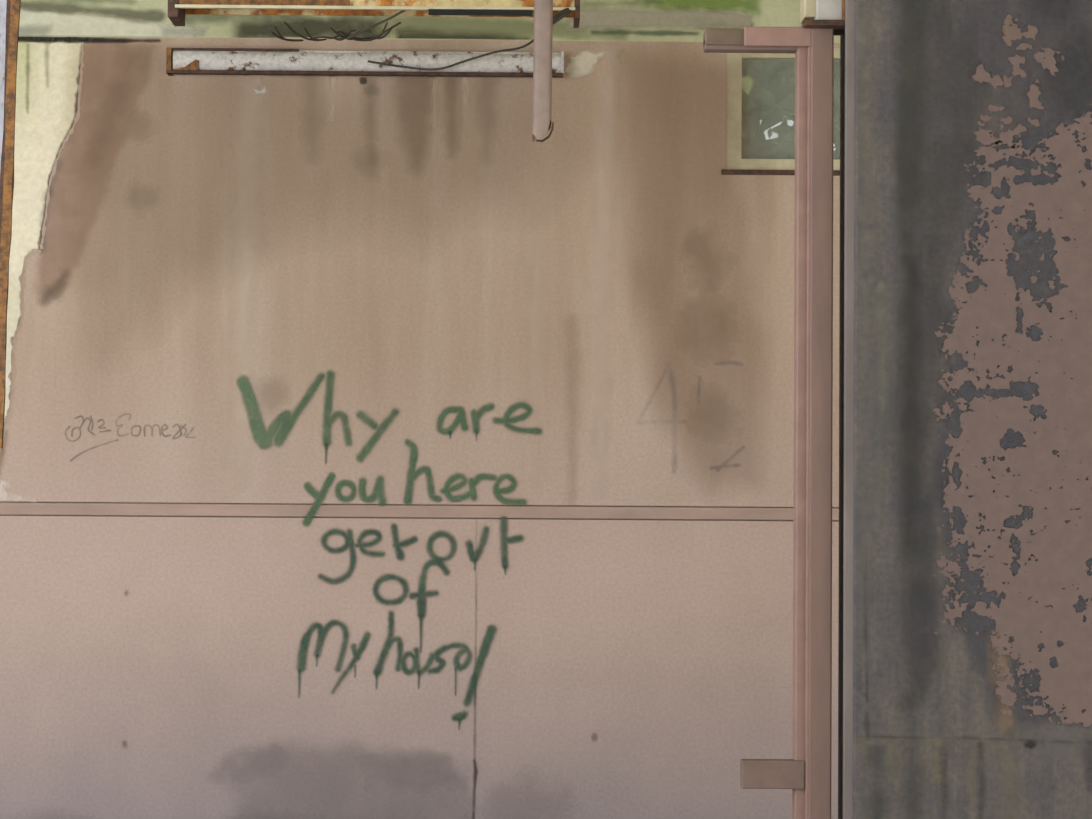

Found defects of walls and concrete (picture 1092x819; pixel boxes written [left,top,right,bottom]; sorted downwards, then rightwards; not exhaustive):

water stain [958,139,1066,341]
water stain [939,450,995,489]
water stain [951,351,1047,433]
peeling [933,14,1092,748]
water stain [946,506,1067,718]
water stain [1063,584,1092,622]